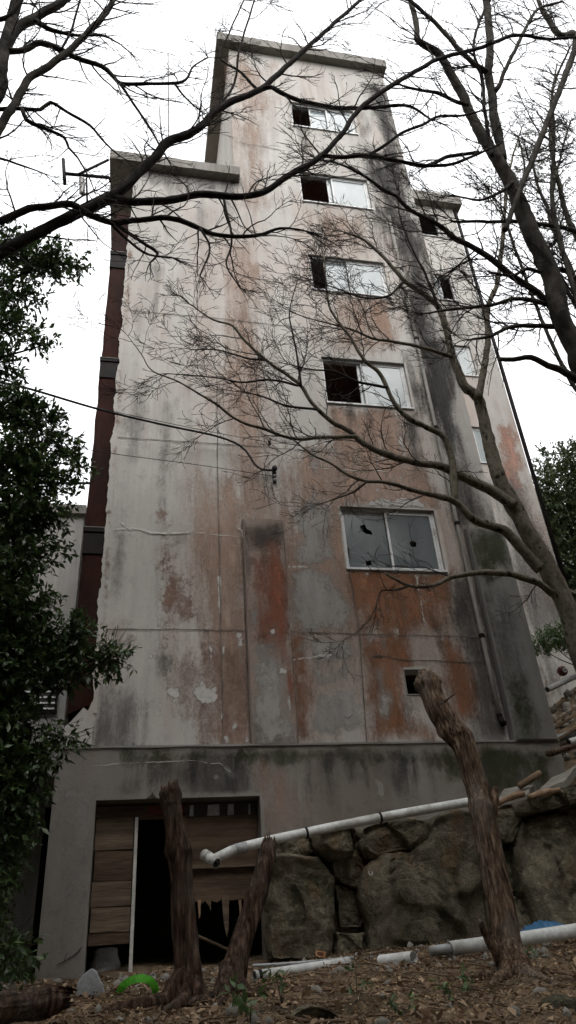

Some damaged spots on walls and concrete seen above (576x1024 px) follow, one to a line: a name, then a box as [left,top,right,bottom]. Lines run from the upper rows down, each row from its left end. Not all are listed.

corrosion [157,554,193,623]
corrosion [194,329,450,744]
corrosion [501,427,547,542]
peeling [193,680,218,703]
water stain [456,585,500,737]